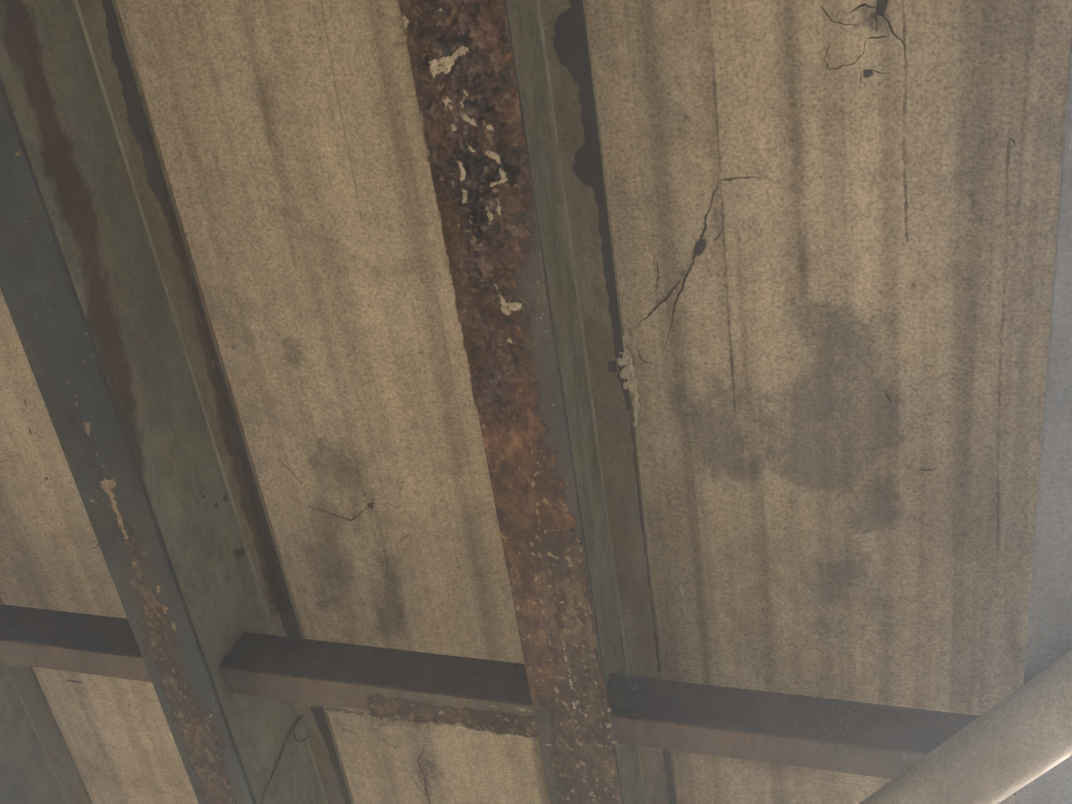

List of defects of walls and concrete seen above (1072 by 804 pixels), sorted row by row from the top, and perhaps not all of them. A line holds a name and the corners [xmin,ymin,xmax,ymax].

crack [820,0,906,84]
corrosion [2,0,143,477]
corrosion [427,125,468,300]
corrosion [461,322,487,386]
crack [634,176,760,364]
corrosion [367,342,621,804]
crack [383,739,436,804]